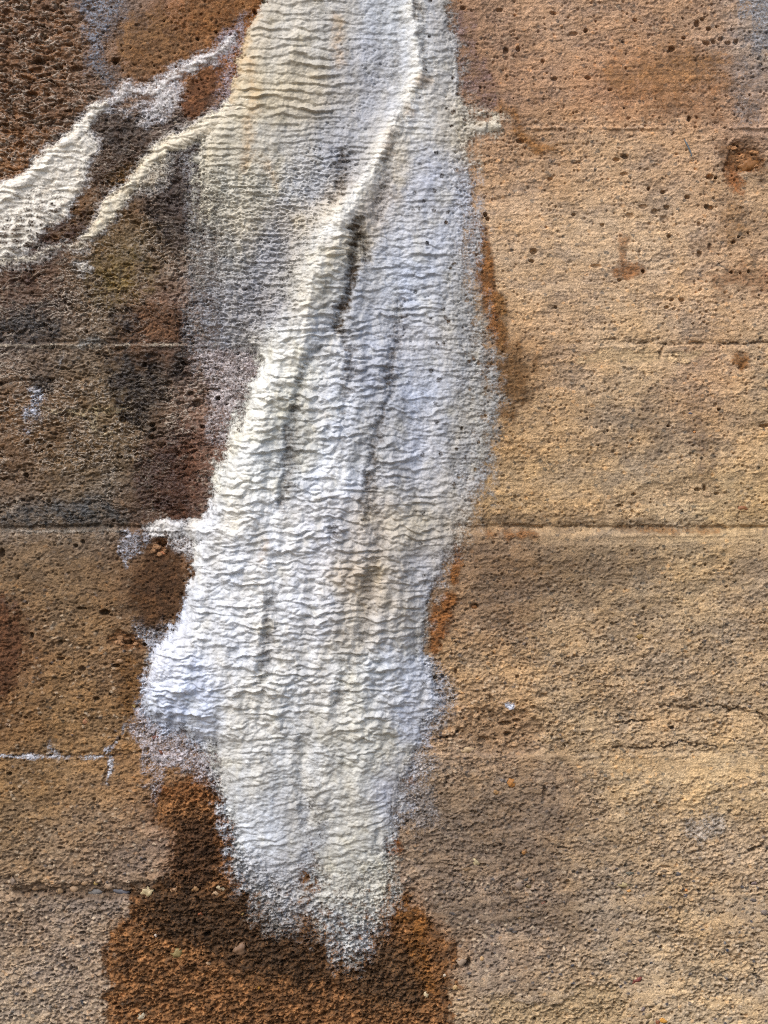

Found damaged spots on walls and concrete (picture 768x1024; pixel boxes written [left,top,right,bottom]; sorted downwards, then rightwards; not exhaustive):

corrosion [101,776,463,1024]
damp [0,0,587,966]